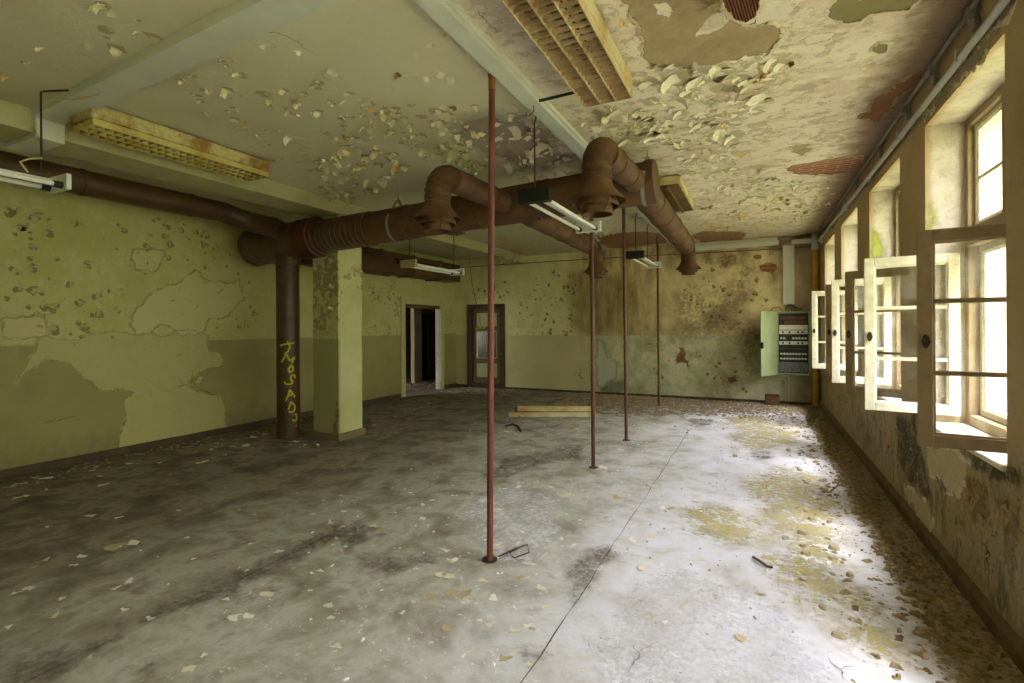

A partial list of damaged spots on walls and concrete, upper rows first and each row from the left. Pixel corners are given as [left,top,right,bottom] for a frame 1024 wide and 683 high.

spalling [829,0,921,25]
spalling [867,40,894,53]
peeling [255,68,582,205]
spalling [577,0,865,243]
spalling [856,74,922,122]
flaking render [594,214,667,249]
peeling [0,206,228,447]
spalling [648,341,722,388]
leakage [896,416,931,498]